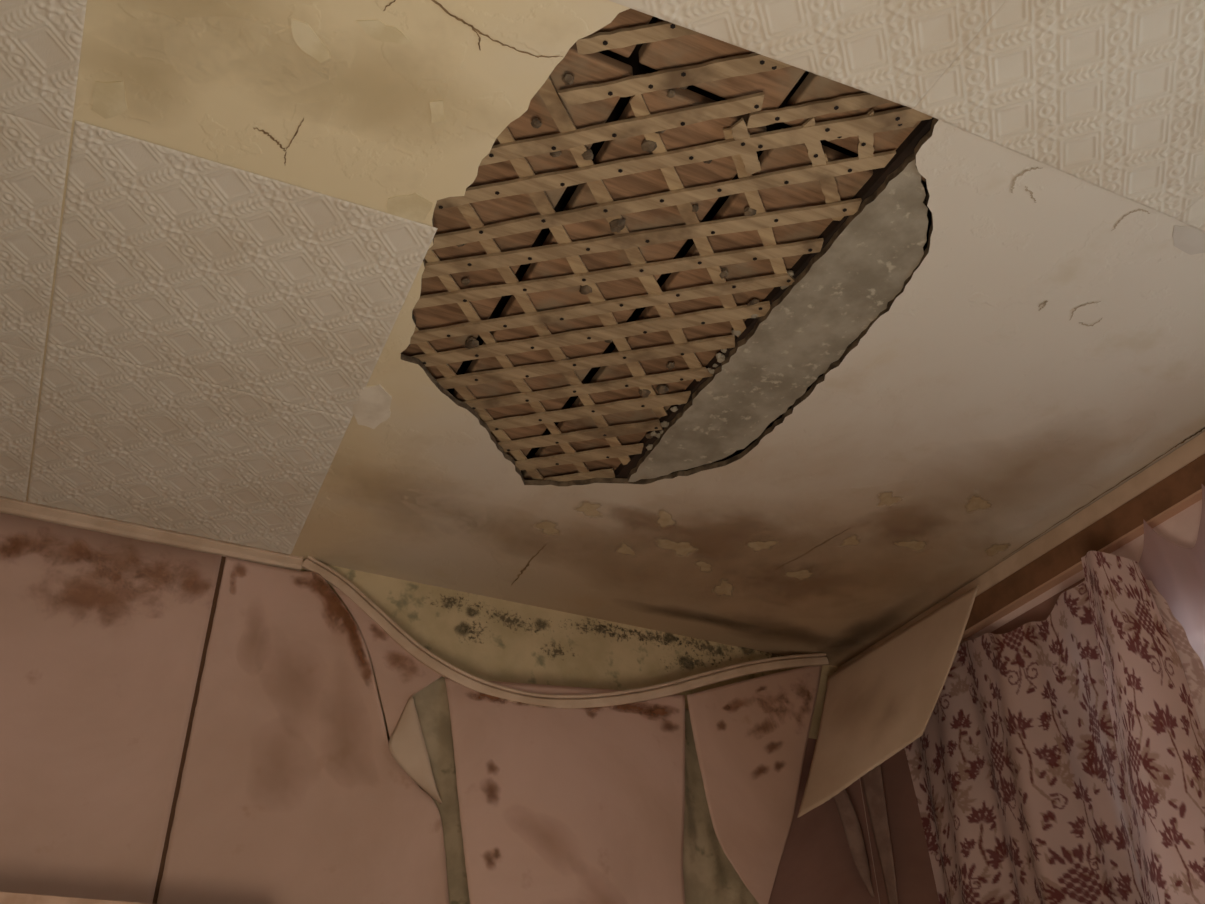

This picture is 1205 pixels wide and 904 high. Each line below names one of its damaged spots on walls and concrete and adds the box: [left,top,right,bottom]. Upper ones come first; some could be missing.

crack [432,0,563,58]
crack [253,118,304,164]
damp [431,596,546,639]
damp [571,620,783,668]
peeling [833,765,898,904]